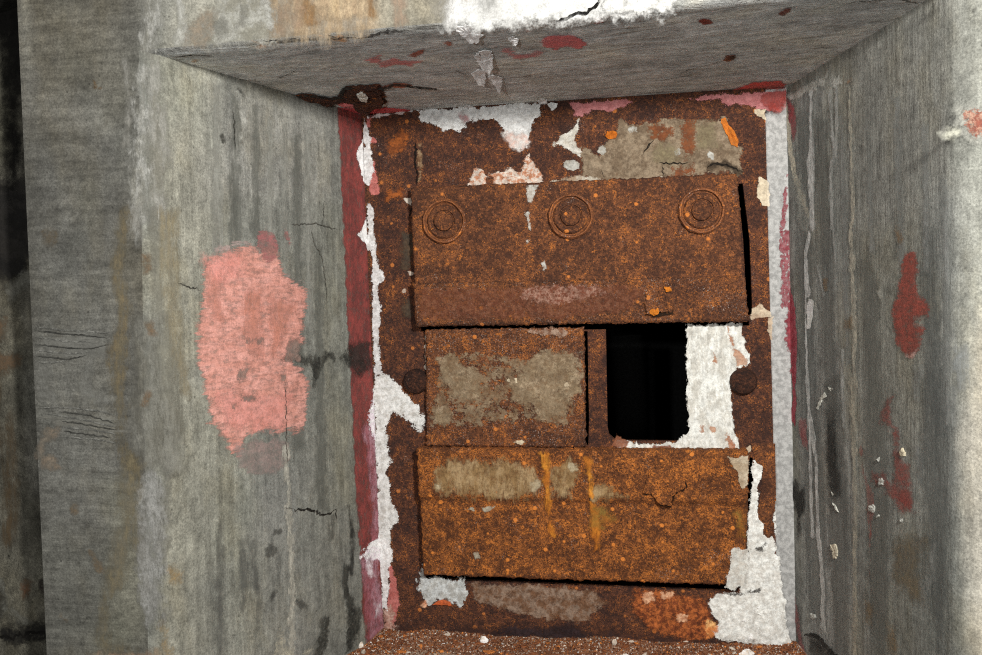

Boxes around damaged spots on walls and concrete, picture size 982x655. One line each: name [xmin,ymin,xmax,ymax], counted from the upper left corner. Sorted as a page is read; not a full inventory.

crack [558,0,600,21]
peeling [296,24,809,243]
corrosion [721,118,739,148]
peeling [419,283,644,338]
peeling [357,204,584,611]
corrosion [540,452,556,537]
peeling [612,303,798,655]
corrosion [751,443,776,538]
crack [0,622,46,646]
peeling [416,567,606,623]
corrosion [458,588,713,644]
crack [804,632,837,655]